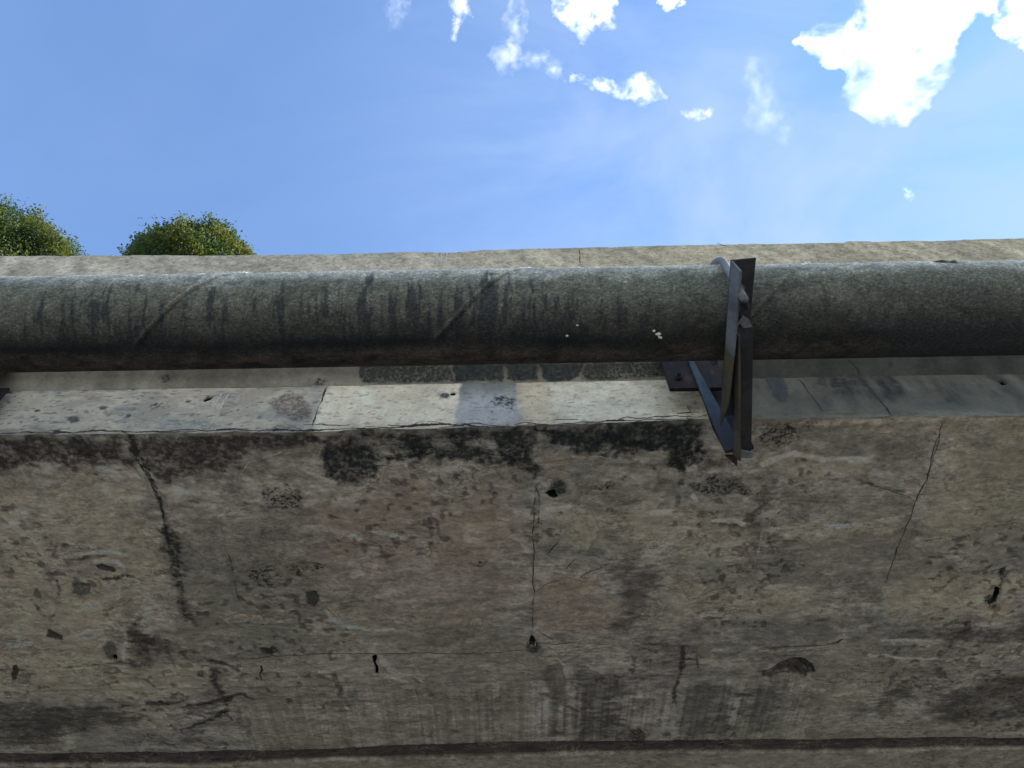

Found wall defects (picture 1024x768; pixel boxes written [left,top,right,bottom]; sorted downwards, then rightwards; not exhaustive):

crack [0,387,705,543]
leakage [0,421,707,618]
crack [251,489,609,680]
spalling [757,644,833,677]
crack [861,423,943,582]